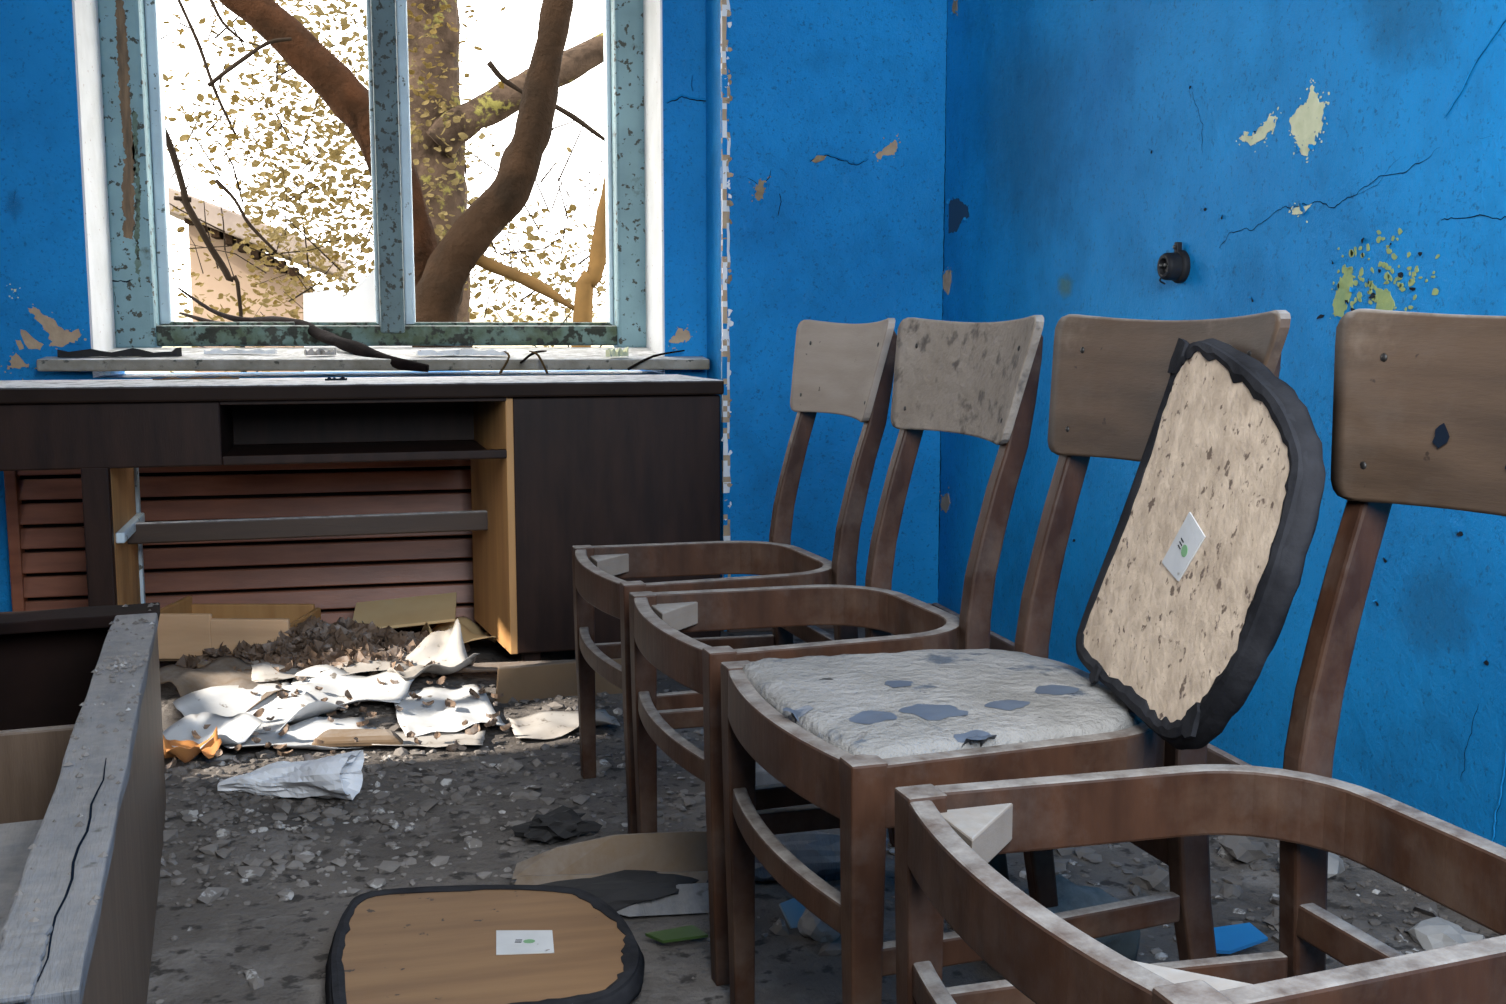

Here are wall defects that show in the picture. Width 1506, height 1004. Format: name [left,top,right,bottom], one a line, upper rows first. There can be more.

peeling [873,135,901,162]
peeling [1236,79,1330,163]
crack [1219,19,1506,248]
peeling [1316,228,1440,321]
peeling [1,284,87,380]
crack [1491,750,1506,842]